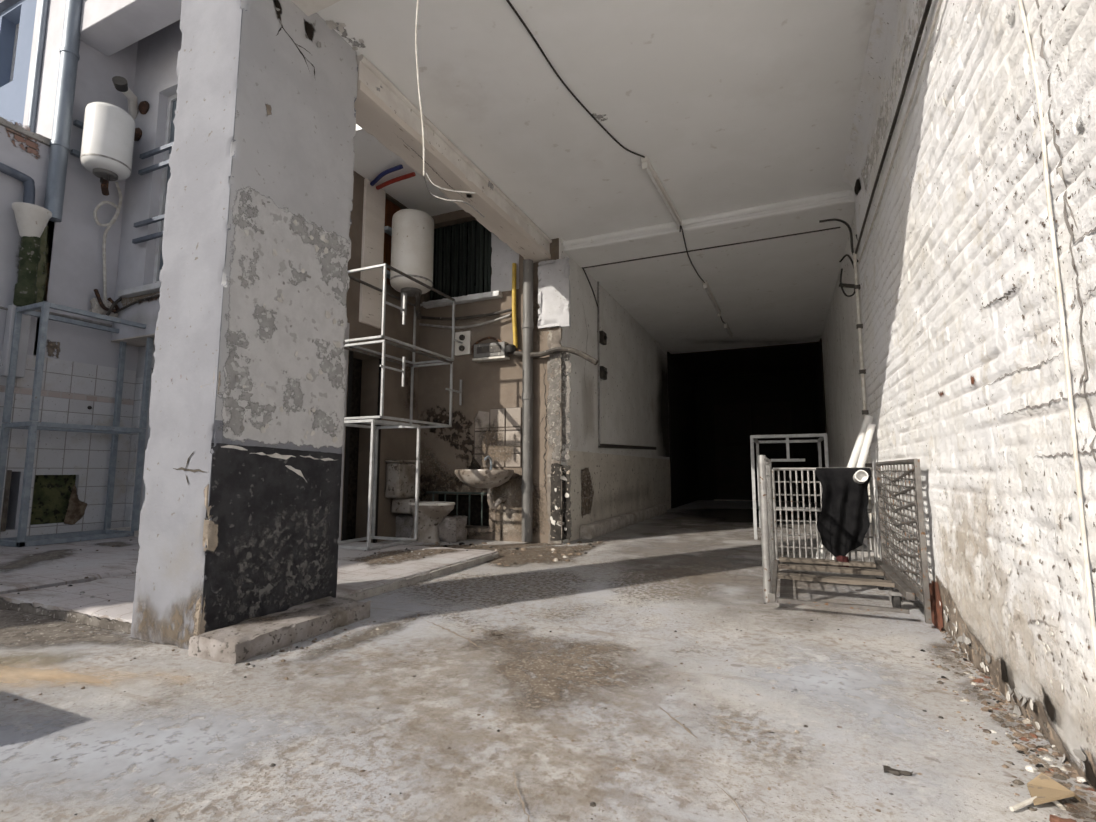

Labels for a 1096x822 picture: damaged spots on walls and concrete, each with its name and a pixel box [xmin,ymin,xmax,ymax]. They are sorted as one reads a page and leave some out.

crack [276,19,315,75]
flaking render [6,122,40,159]
crack [1035,0,1096,463]
peeling [203,187,351,482]
spalling [547,352,594,541]
spalling [202,484,218,552]
spalling [194,596,206,636]